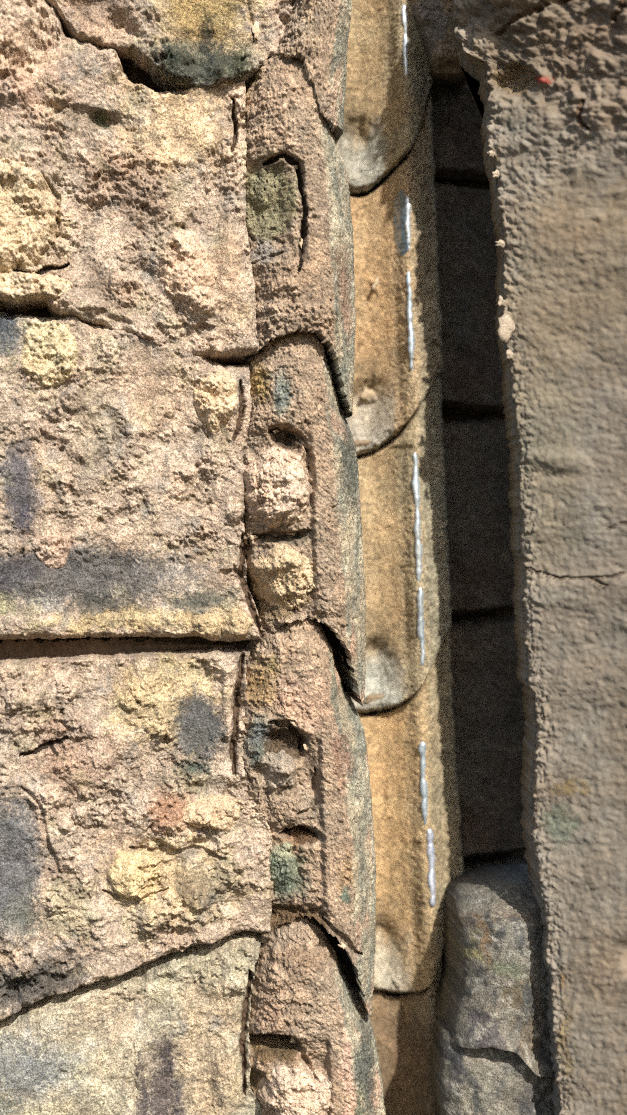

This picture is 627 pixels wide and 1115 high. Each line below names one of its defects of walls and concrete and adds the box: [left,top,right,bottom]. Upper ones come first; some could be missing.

crack [494,0,573,36]
crack [610,0,627,22]
crack [119,58,166,92]
damp [161,37,179,75]
damp [198,16,216,66]
damp [231,52,248,79]
flaking render [487,150,500,179]
flaking render [498,296,515,360]
crack [526,567,625,587]